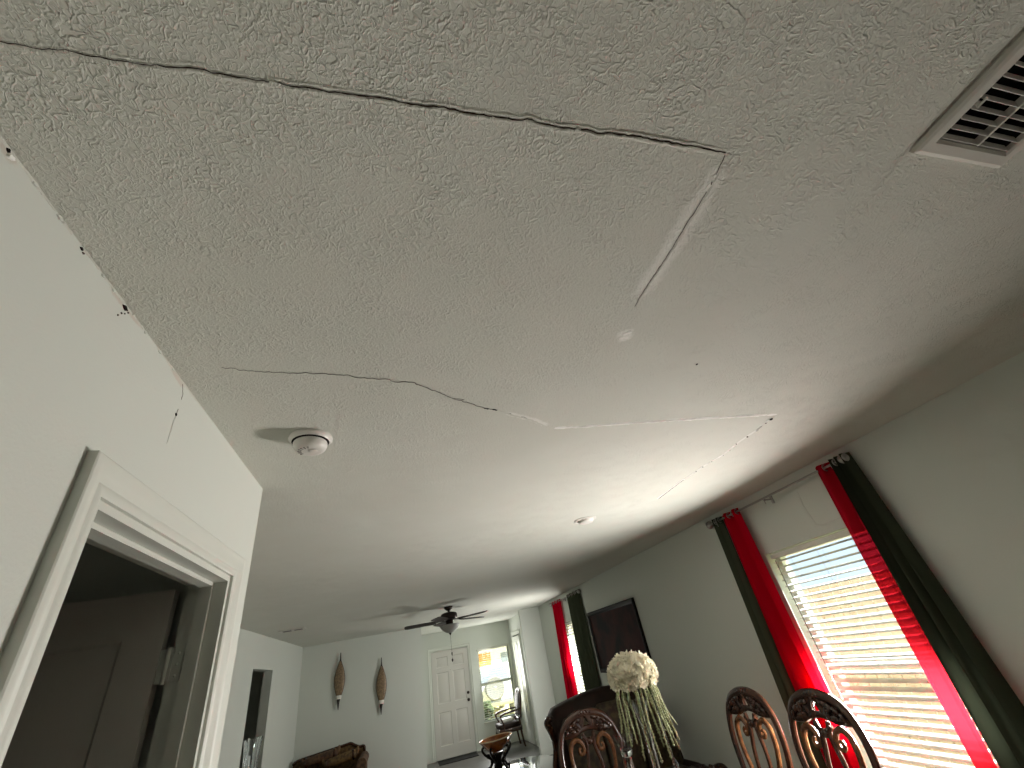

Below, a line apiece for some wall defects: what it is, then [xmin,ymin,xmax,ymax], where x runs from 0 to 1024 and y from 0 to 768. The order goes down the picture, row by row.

crack [0,35,746,307]
crack [220,367,554,429]